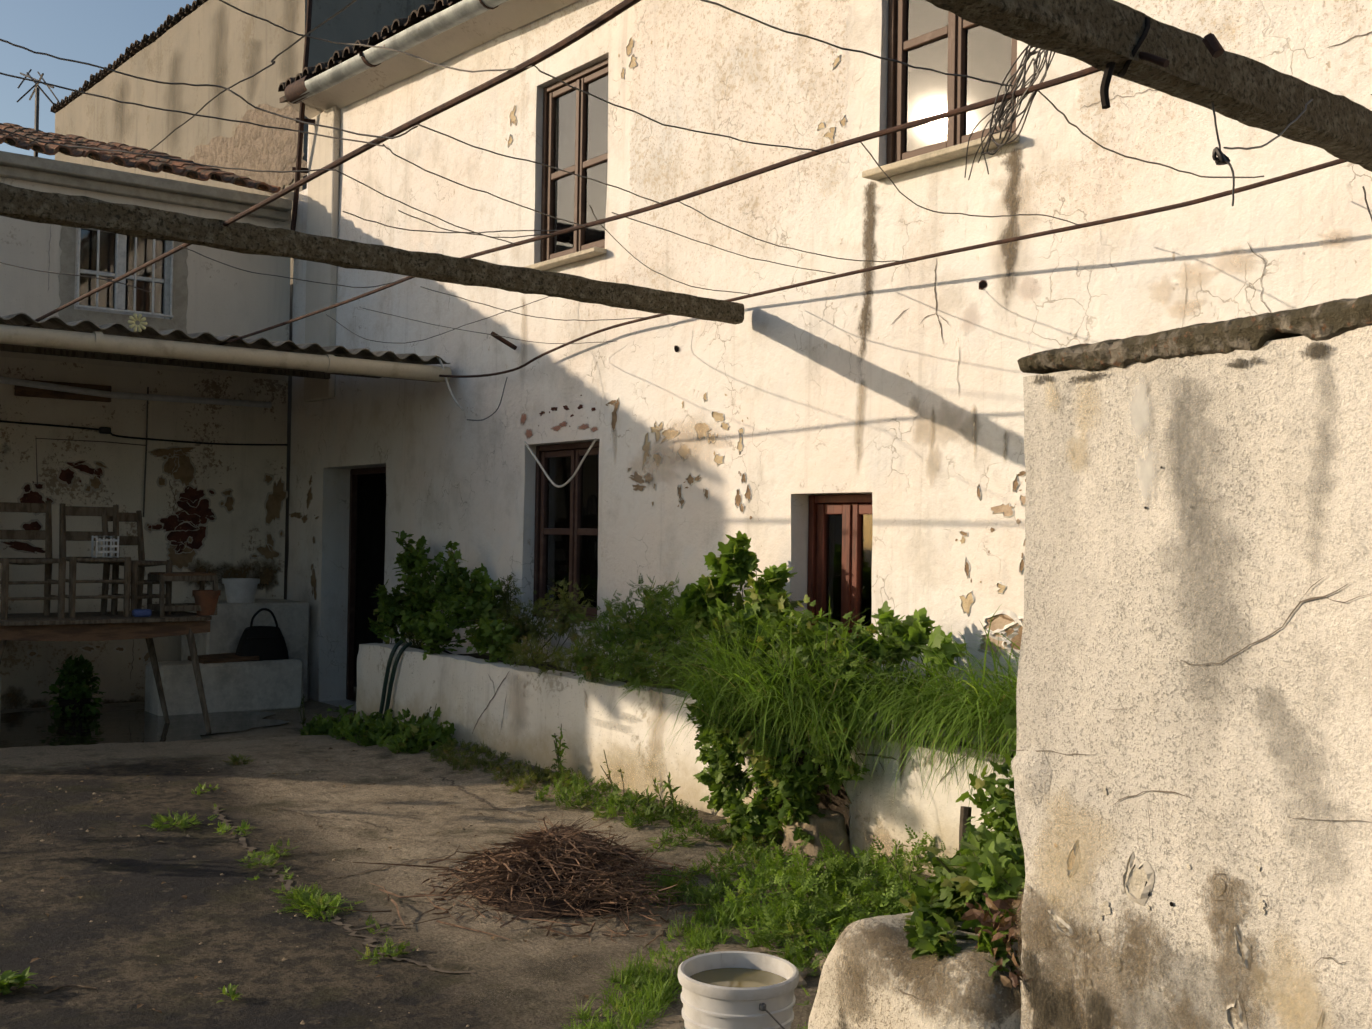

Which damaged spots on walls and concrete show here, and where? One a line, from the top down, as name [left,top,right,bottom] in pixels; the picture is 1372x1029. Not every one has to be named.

damp [858,182,876,361]
damp [1001,149,1022,292]
flaking render [0,460,108,554]
flaking render [144,446,235,571]
peeling [538,395,620,432]
peeling [627,392,752,519]
peeling [977,470,1026,575]
spalling [955,530,1024,658]
crack [1171,577,1369,666]
damp [835,870,1267,1029]